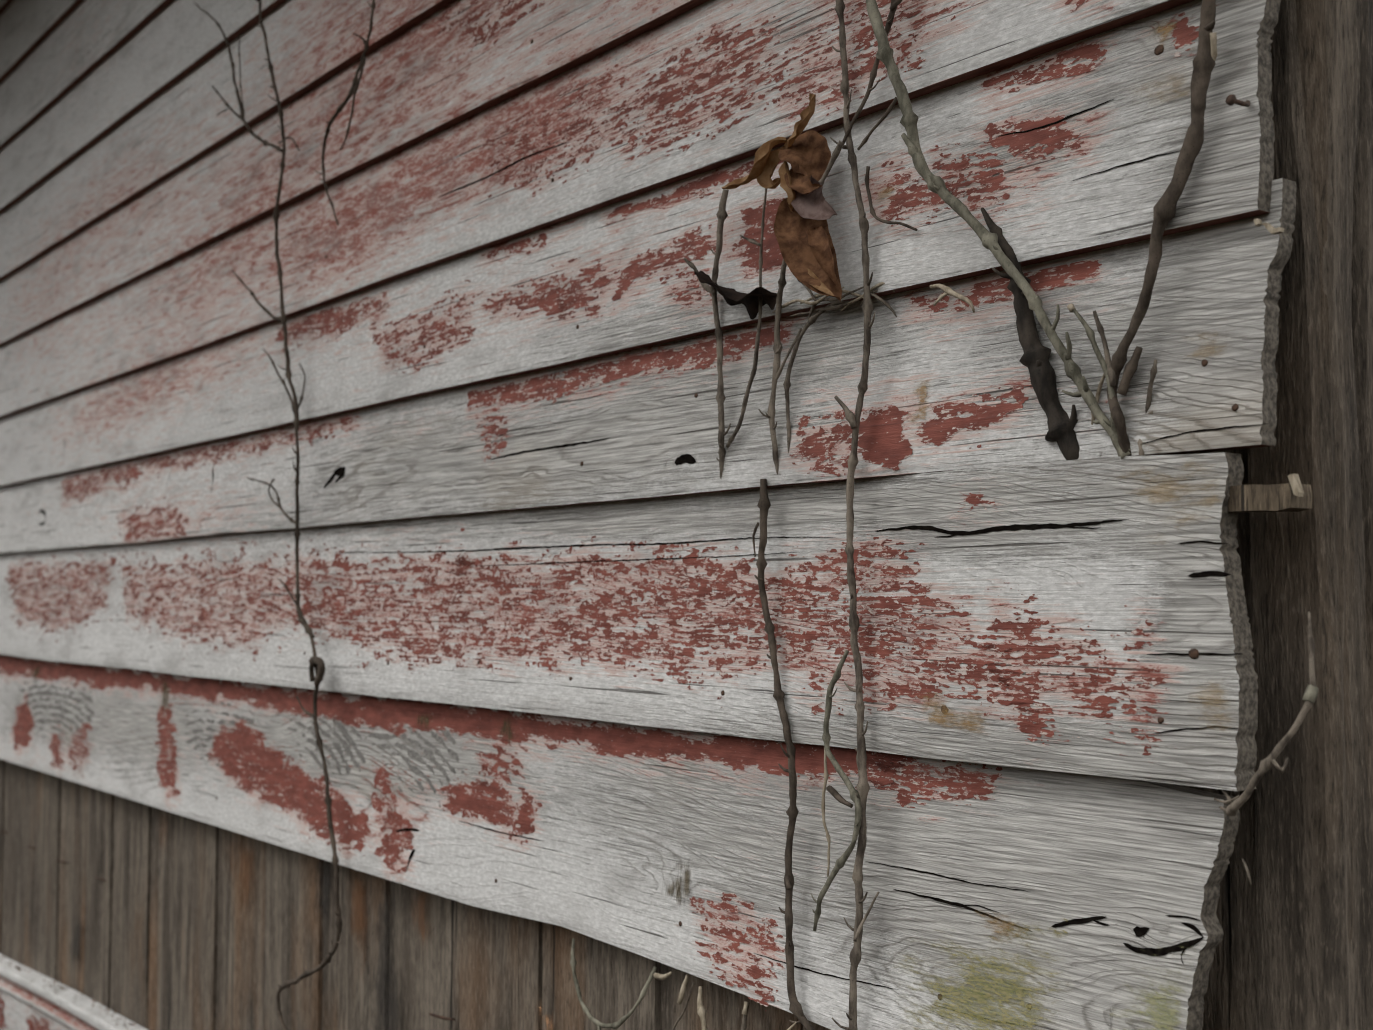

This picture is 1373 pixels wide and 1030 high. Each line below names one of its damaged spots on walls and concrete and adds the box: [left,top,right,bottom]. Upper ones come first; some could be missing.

peeling [437,0,545,55]
peeling [482,0,962,204]
peeling [980,42,1107,93]
peeling [1170,12,1199,57]
peeling [605,161,754,225]
peeling [879,115,1086,232]
peeling [274,197,787,375]
peeling [467,324,791,466]
crack [876,519,1129,537]
peeling [0,415,1169,874]
peeling [689,892,785,1011]
crack [866,861,1204,965]